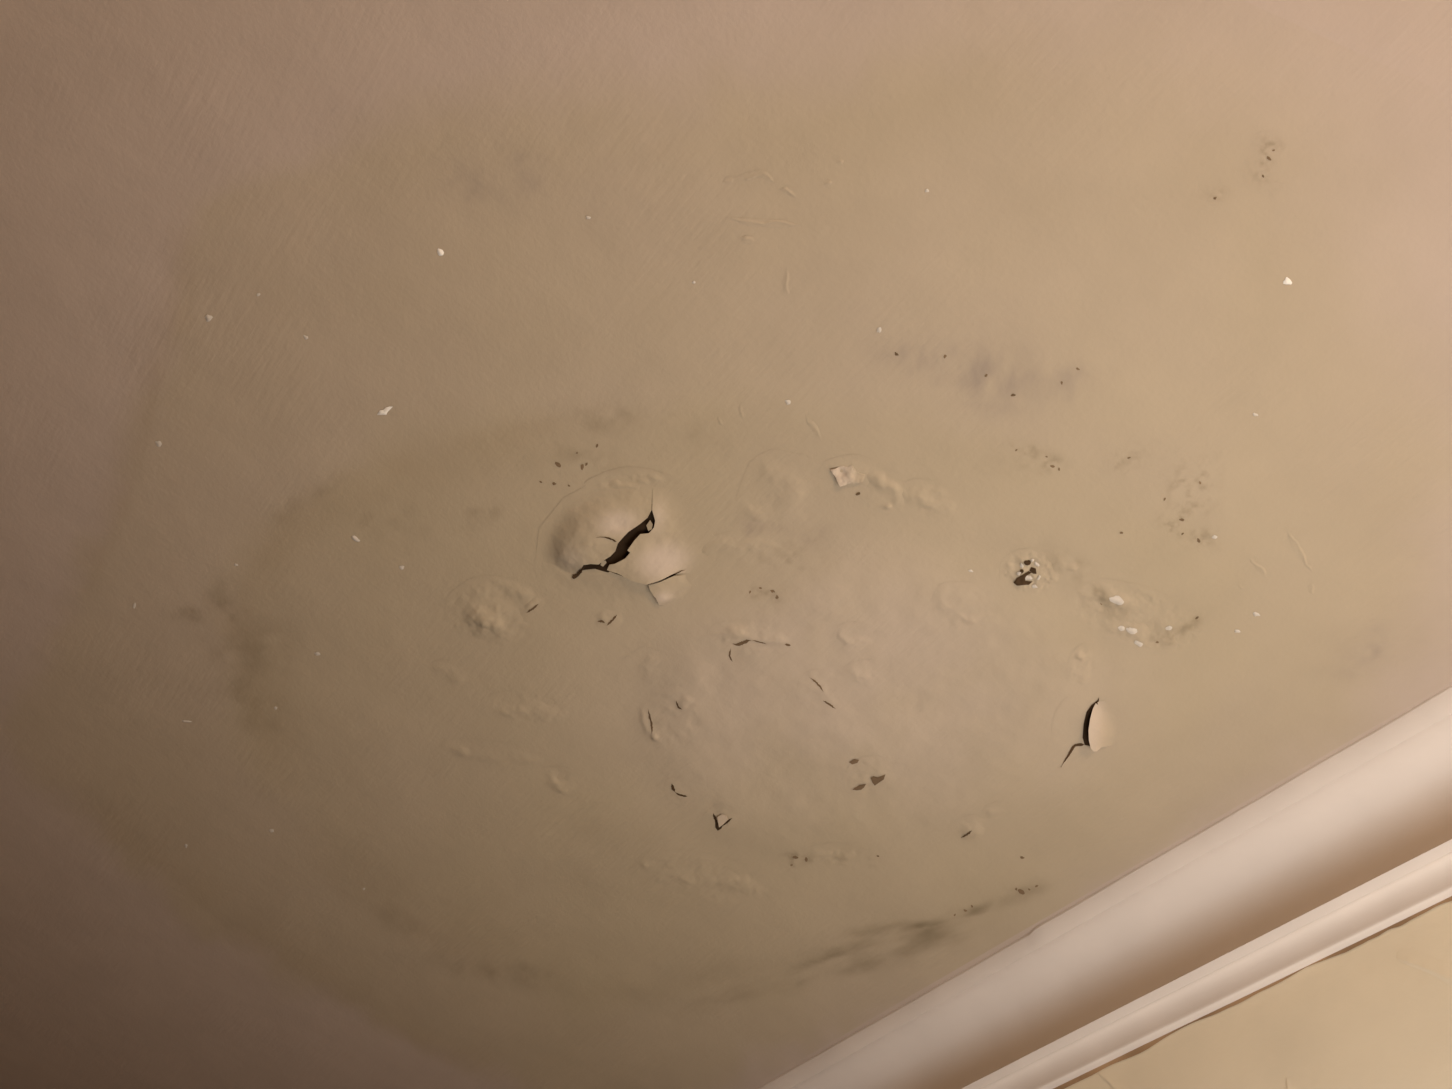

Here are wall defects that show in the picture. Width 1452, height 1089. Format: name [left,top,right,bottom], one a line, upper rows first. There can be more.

leakage [51,203,204,647]
leakage [228,410,545,611]
peeling [819,454,882,495]
leakage [1150,445,1228,554]
peeling [999,548,1062,597]
leakage [158,568,317,742]
leakage [238,717,312,802]
peeling [1051,695,1123,767]
leakage [56,781,541,1089]
leakage [357,889,575,999]
leakage [562,942,830,1015]
leakage [672,892,1038,1019]